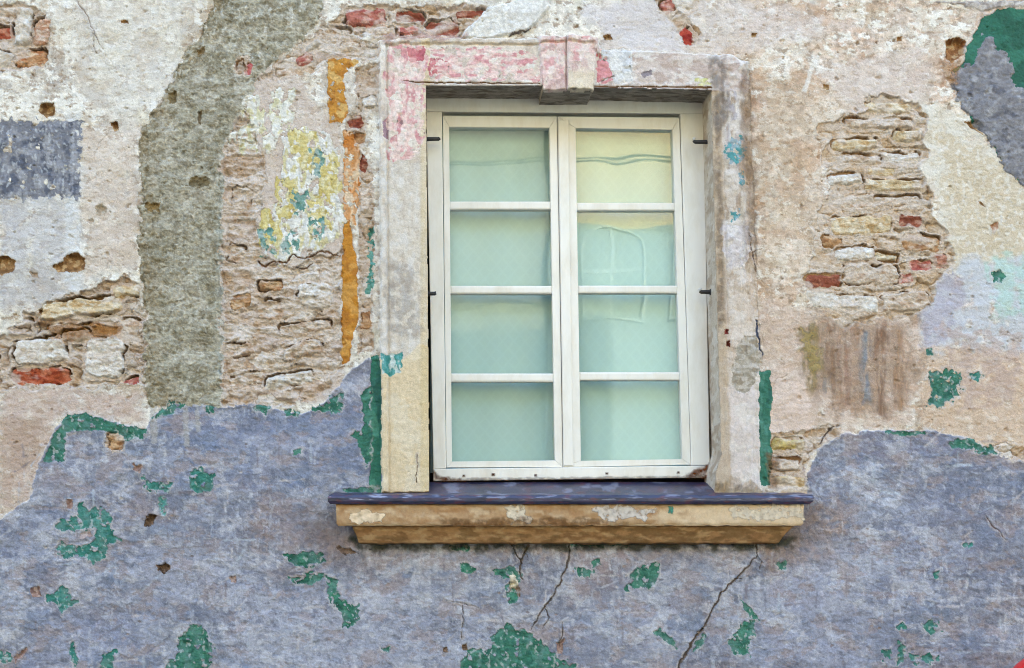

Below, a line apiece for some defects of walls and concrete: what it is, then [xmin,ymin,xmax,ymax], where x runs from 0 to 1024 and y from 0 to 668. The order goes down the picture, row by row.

flaking render [0,1,53,73]
flaking render [186,2,613,494]
flaking render [800,93,956,331]
flaking render [0,273,150,393]
flaking render [725,329,840,490]
leakage [799,324,835,391]
crack [531,544,571,647]
crack [678,544,763,668]